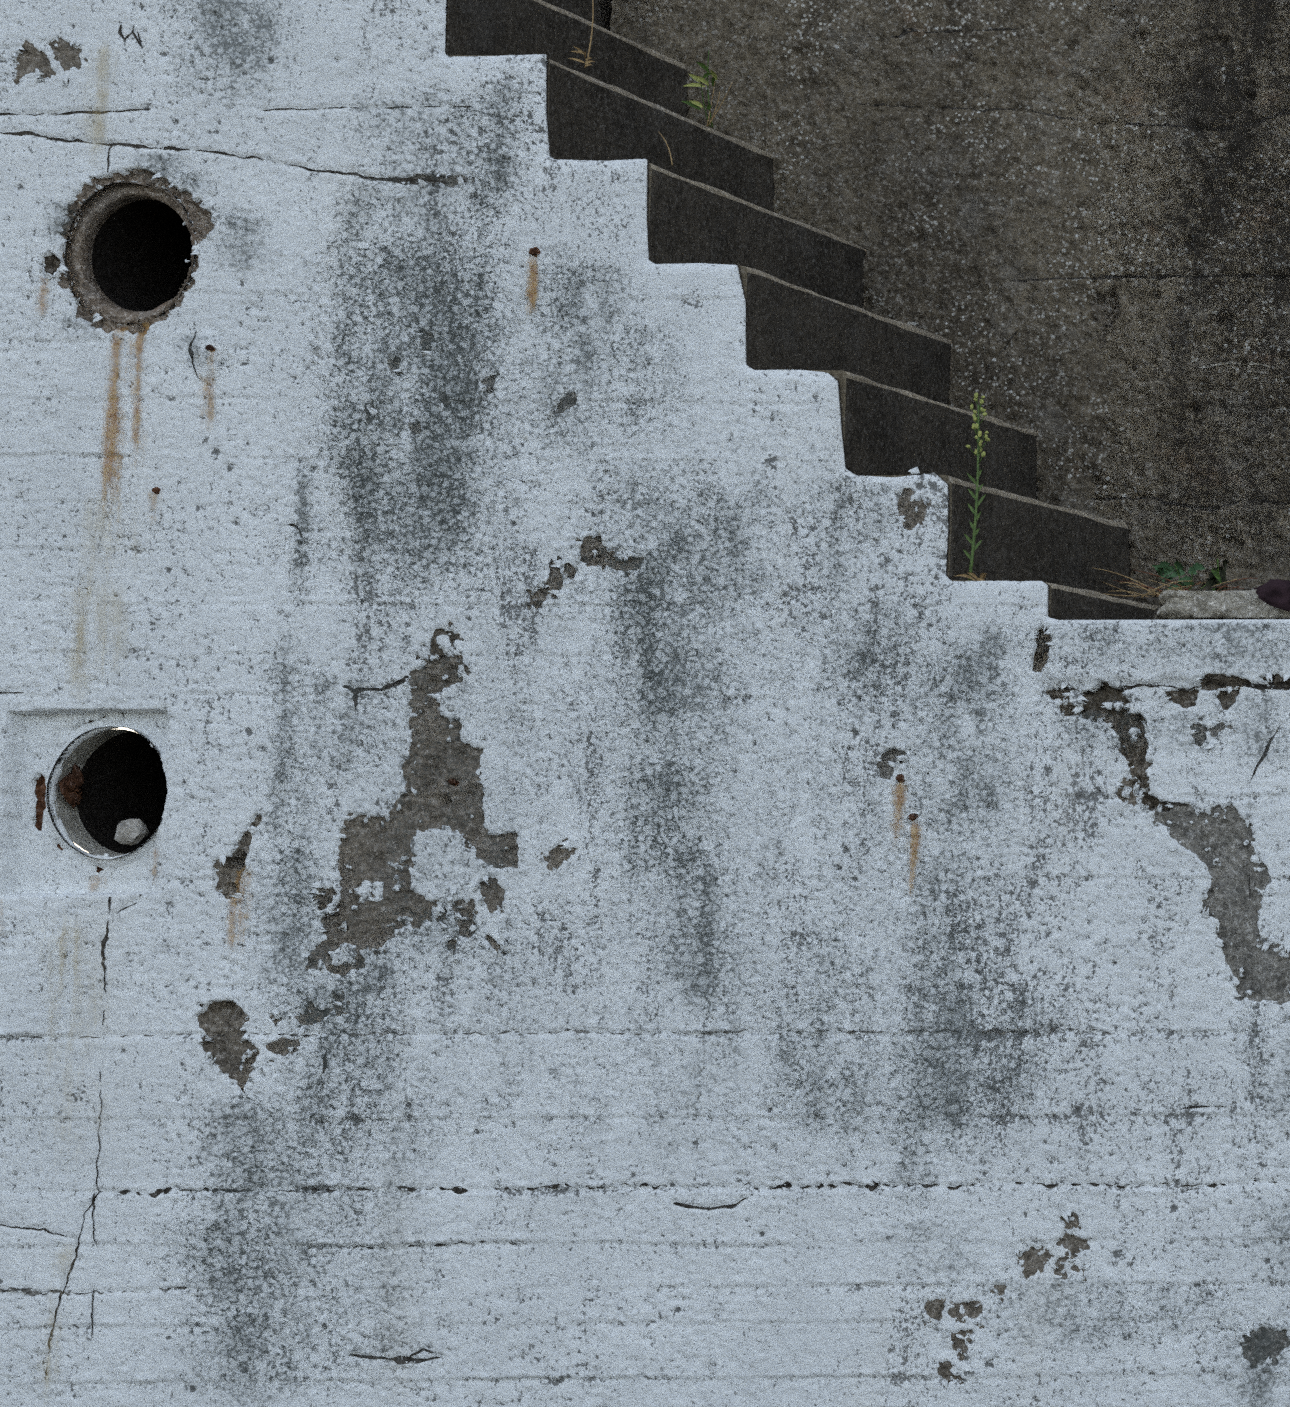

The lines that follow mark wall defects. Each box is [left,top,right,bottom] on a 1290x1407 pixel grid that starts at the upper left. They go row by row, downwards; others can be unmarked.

crack [0,108,466,185]
corrosion [527,262,537,304]
corrosion [103,323,149,494]
peeling [526,534,644,613]
water stain [160,79,684,1407]
peeling [197,621,519,1093]
corrosion [894,783,919,887]
peeling [1046,672,1290,1006]
crack [78,894,409,1074]
crack [442,1027,1112,1035]
crack [0,1071,1277,1380]
peeling [1014,1210,1090,1286]